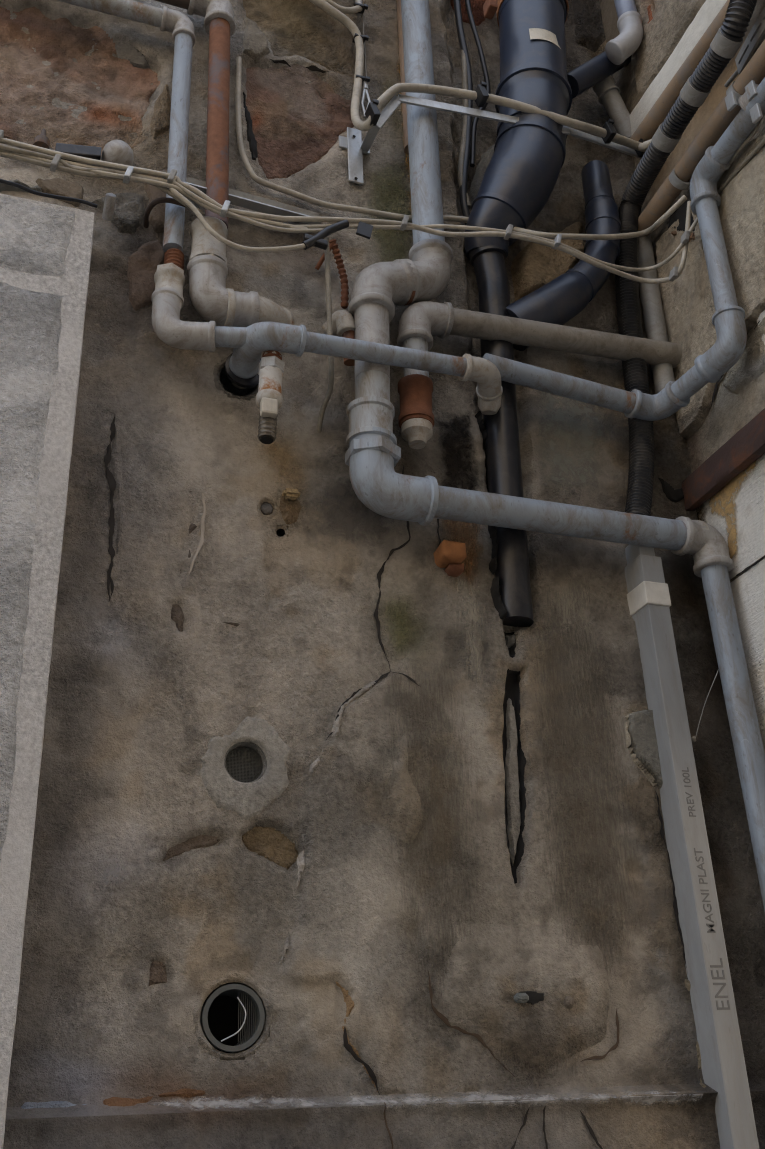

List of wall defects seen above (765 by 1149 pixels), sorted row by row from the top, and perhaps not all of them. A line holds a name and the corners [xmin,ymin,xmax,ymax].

crack [104,416,124,601]
crack [326,519,441,740]
crack [502,631,526,884]
flaking render [163,835,220,861]
flaking render [242,826,305,888]
crack [336,982,393,1149]
crack [511,1106,548,1149]
crack [580,1111,603,1149]